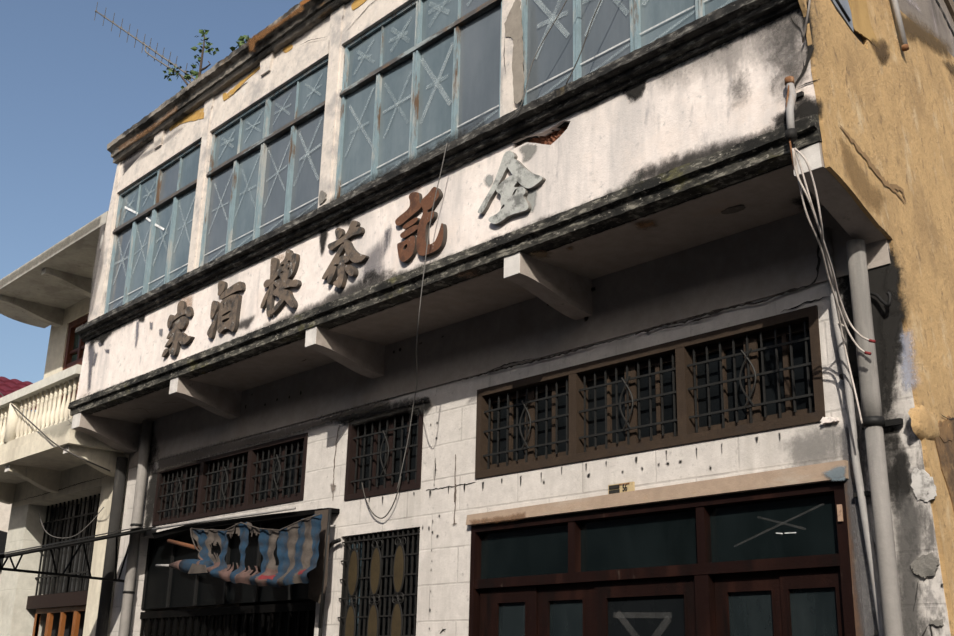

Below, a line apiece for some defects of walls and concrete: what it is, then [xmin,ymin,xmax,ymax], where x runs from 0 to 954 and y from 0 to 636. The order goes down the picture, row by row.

peeling [504,0,524,104]
water stain [698,3,813,81]
spalling [515,122,569,146]
water stain [581,80,645,111]
water stain [605,96,823,195]
water stain [792,195,816,212]
water stain [836,275,862,407]
water stain [337,397,431,425]
crack [426,454,475,525]
water stain [868,248,925,636]
spalling [911,416,954,512]